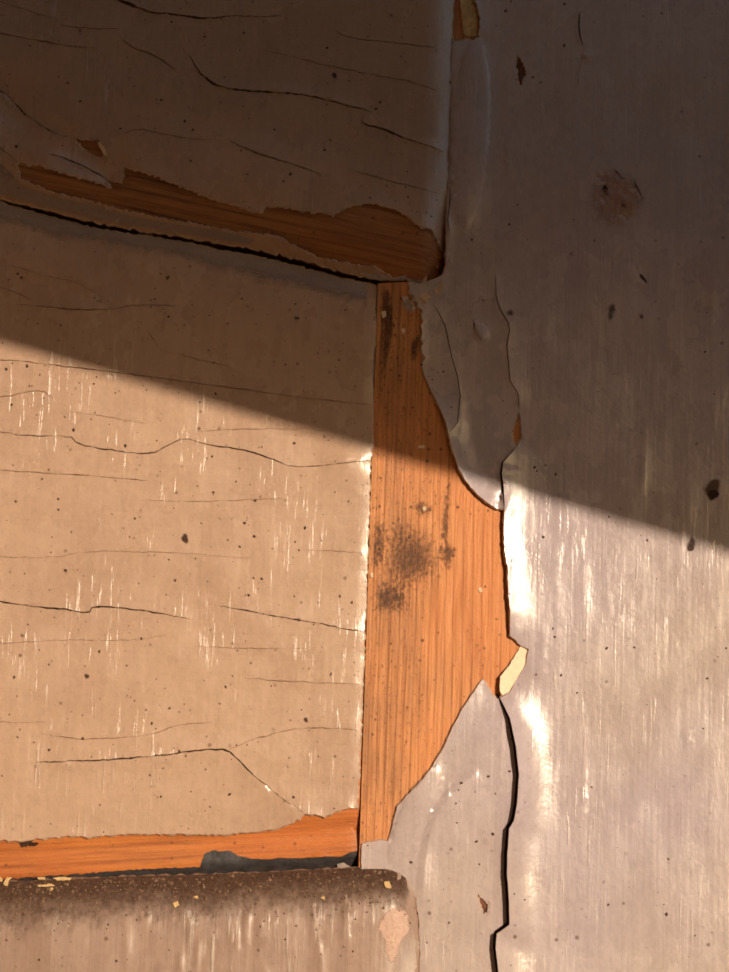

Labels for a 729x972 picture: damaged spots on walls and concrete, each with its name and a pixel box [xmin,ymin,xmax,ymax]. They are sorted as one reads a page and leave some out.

peeling [452,0,479,42]
crack [0,0,434,148]
crack [1,428,363,467]
crack [500,451,513,507]
peeling [0,163,528,881]
leakage [375,485,455,579]
crack [0,601,193,644]
crack [221,606,361,631]
leakage [378,582,401,608]
crack [0,721,353,813]
crack [493,693,519,972]
peeling [378,908,410,962]